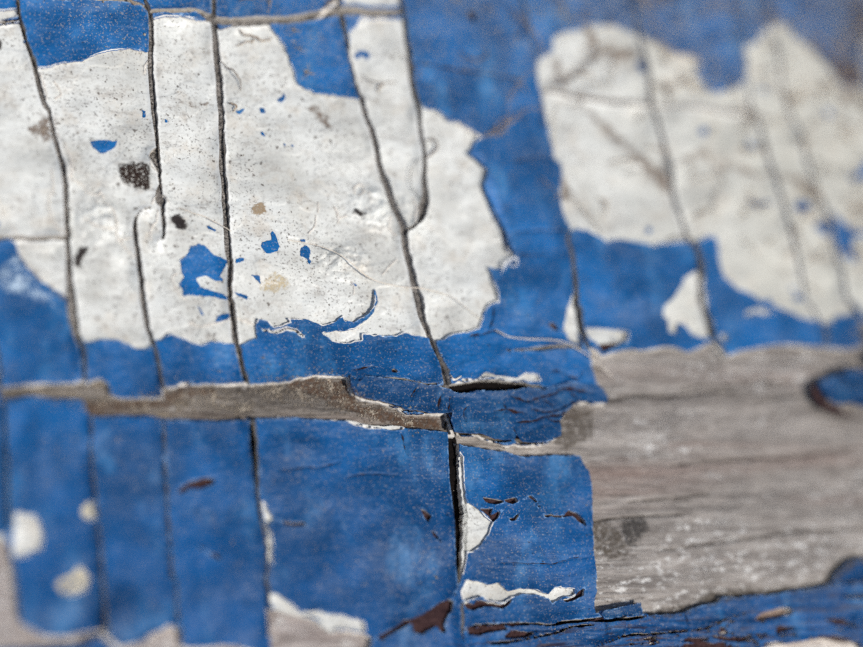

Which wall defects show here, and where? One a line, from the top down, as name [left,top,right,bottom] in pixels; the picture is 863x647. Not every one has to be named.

crack [0,1,86,386]
peeling [0,514,182,647]
crack [132,217,165,403]
crack [144,0,165,240]
peeling [0,10,517,349]
peeling [266,593,452,647]
crack [179,0,587,573]
peeling [0,265,863,626]
crack [461,613,688,645]
crack [635,23,725,360]
peeling [536,24,863,325]
peeling [676,607,859,647]